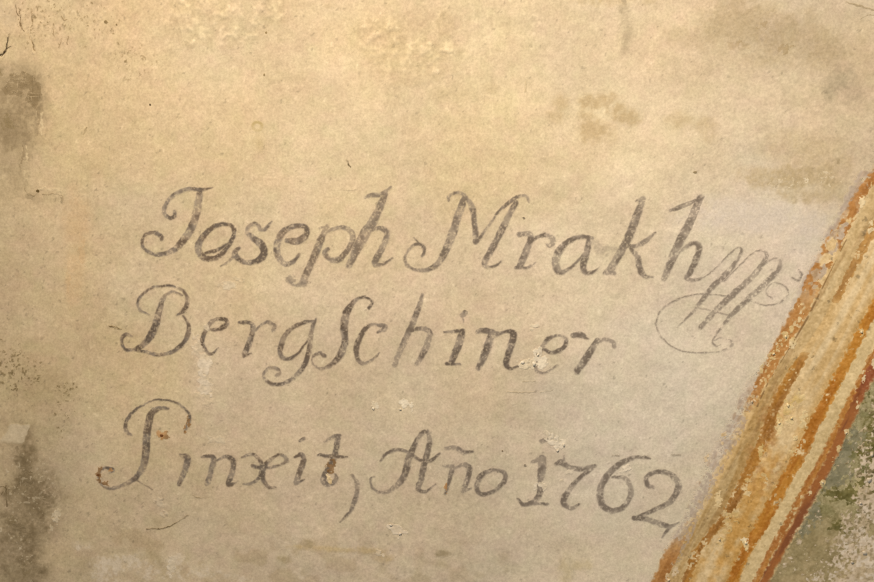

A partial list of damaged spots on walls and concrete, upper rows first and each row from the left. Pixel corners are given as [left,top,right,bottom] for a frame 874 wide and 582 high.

crack [0,5,70,57]
damp [0,0,166,229]
flaking render [773,353,874,582]